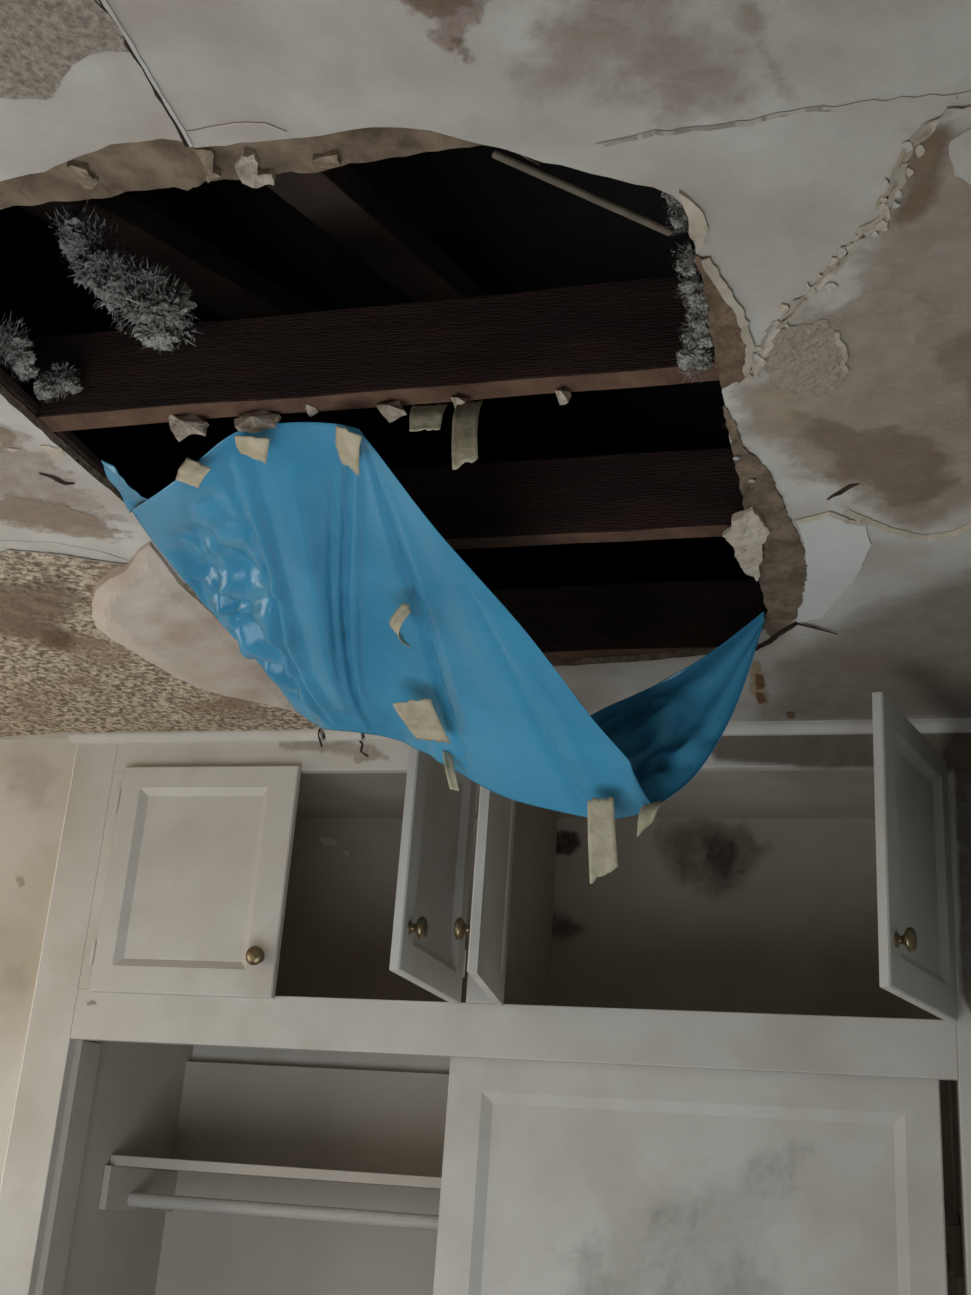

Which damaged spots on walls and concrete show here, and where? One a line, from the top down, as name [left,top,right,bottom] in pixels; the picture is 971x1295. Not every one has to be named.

spalling [0,0,129,100]
crack [596,91,971,148]
peeling [195,147,275,188]
peeling [313,149,341,168]
damp [741,130,971,527]
damp [0,496,118,539]
peeling [722,507,770,581]
crack [827,483,859,500]
spalling [0,540,320,737]
crack [755,622,838,651]
damp [712,734,874,769]
damp [921,733,971,1009]